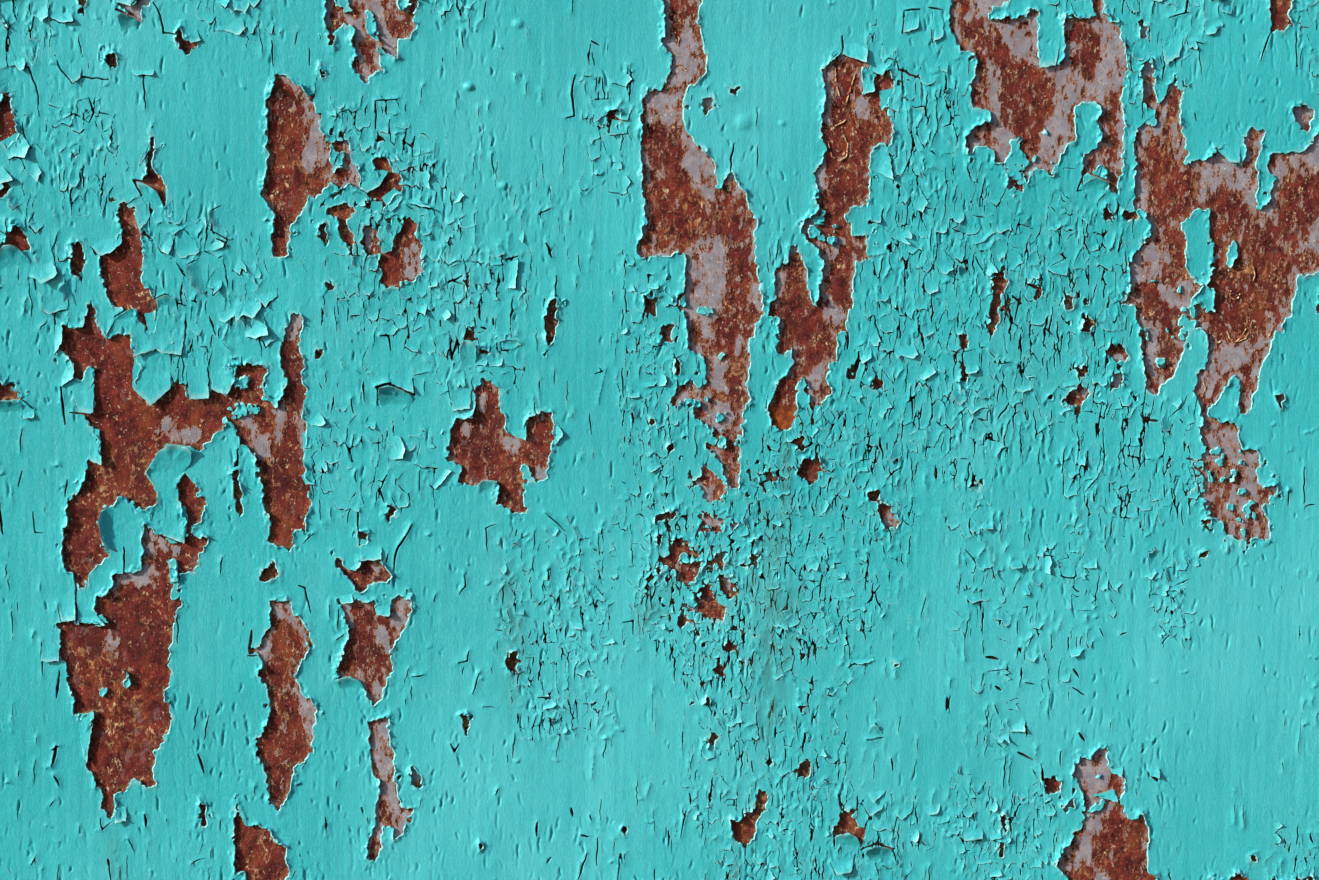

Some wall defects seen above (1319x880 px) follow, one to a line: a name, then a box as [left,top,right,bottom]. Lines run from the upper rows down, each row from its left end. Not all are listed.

crack [447,208,558,404]
crack [1014,295,1059,346]
peeling [0,0,564,861]
peeling [497,0,1319,880]
crack [889,446,976,488]
crack [986,405,1008,441]
crack [1062,360,1180,489]
crack [1288,467,1314,507]
crack [1028,534,1079,592]
crack [981,611,1034,714]
crack [1072,629,1126,695]
crack [751,727,815,840]